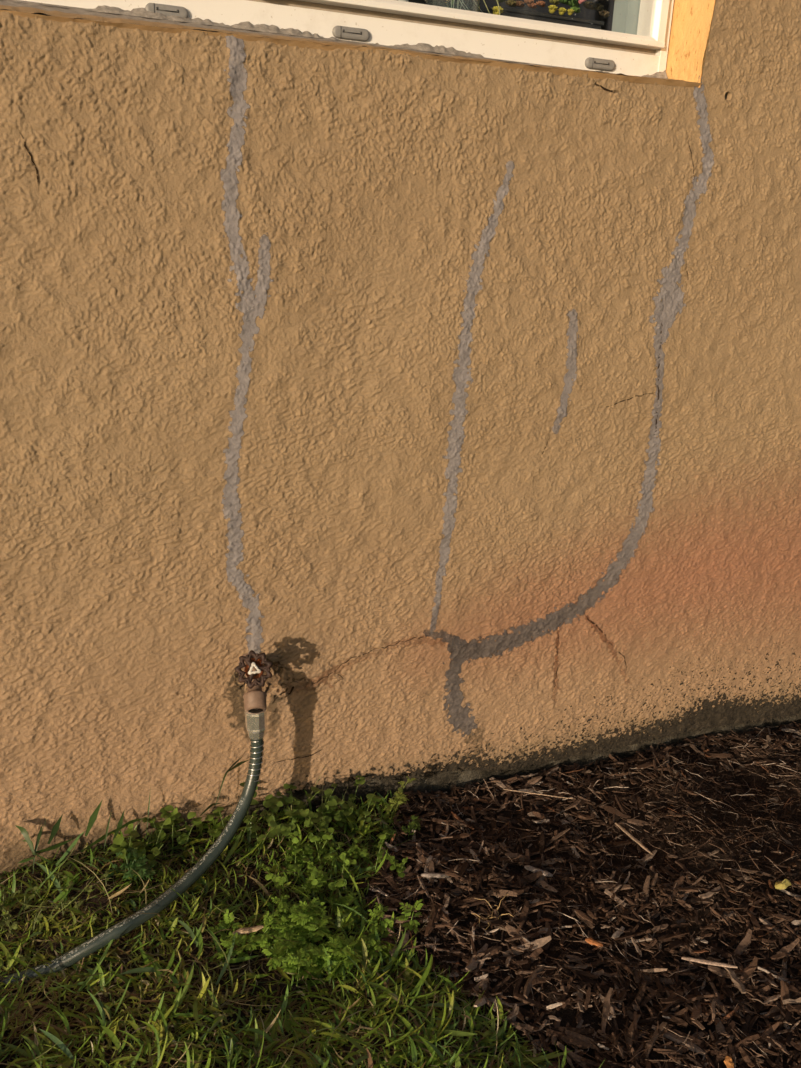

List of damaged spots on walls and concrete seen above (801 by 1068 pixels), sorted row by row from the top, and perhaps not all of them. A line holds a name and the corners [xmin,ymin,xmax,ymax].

leakage [224,672,246,728]
crack [220,35,274,654]
crack [312,78,714,737]
leakage [273,643,801,797]